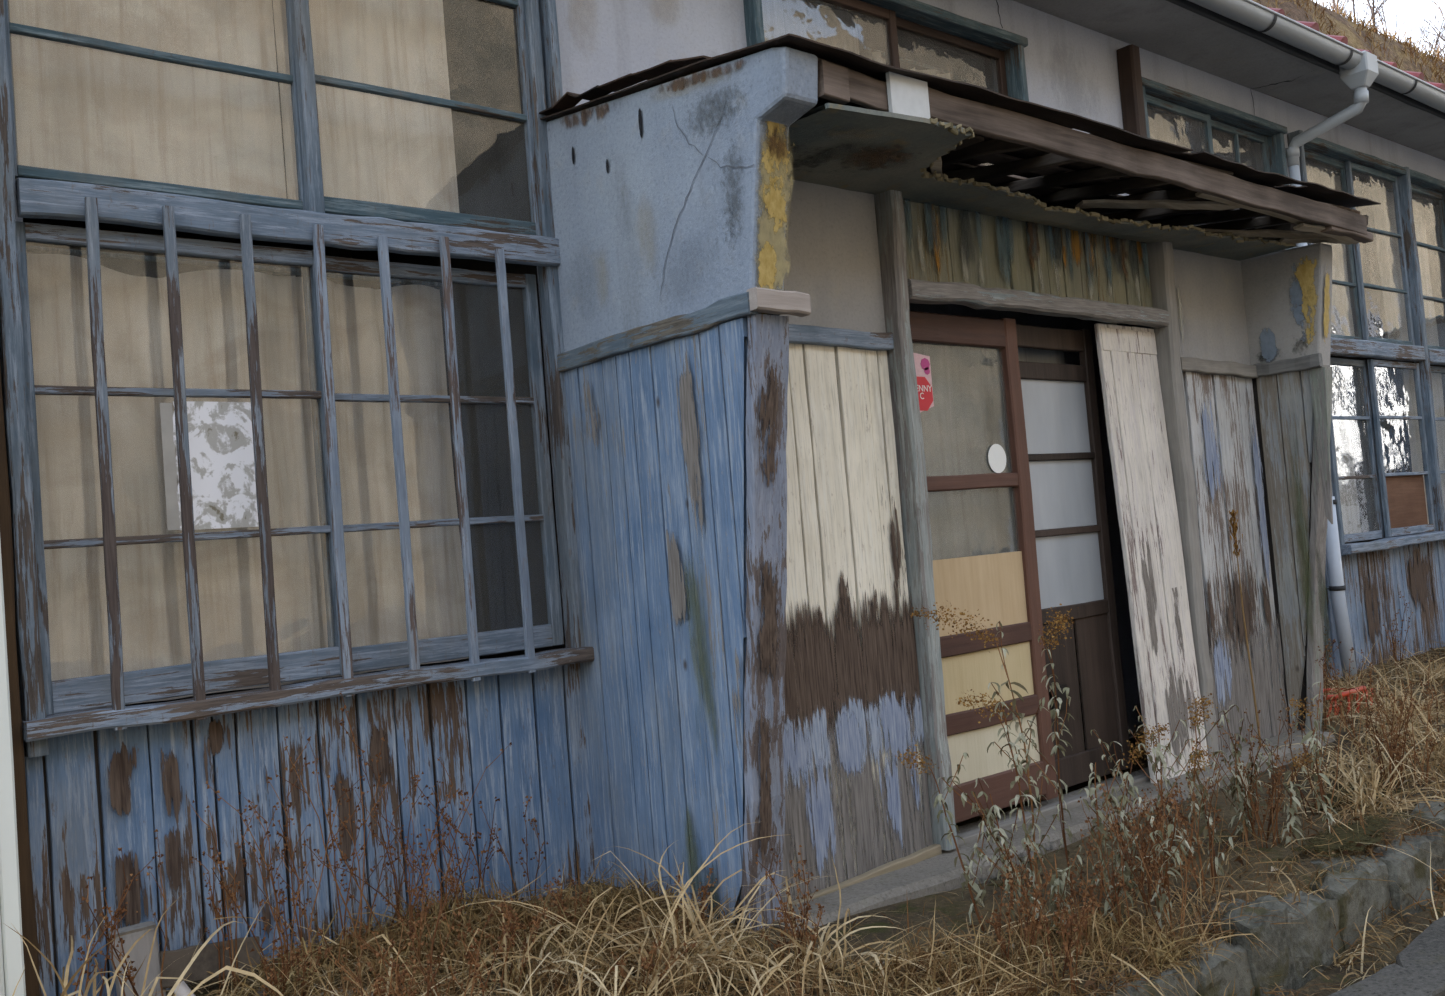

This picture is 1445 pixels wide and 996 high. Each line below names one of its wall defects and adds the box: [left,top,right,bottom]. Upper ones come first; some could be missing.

corrosion [661,60,742,92]
crack [660,103,754,293]
peeling [759,361,781,487]
peeling [107,742,137,817]
peeling [161,748,187,895]
peeling [334,748,356,863]
peeling [369,724,393,789]
peeling [759,487,933,905]
peeling [1141,537,1199,770]
peeling [1207,411,1290,755]
peeling [1357,548,1437,656]
peeling [115,850,148,928]